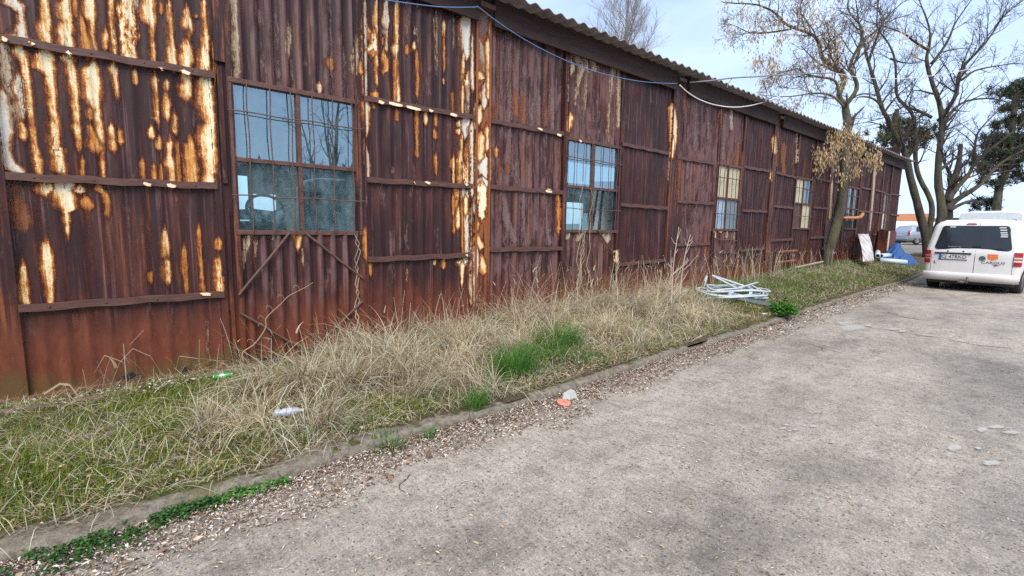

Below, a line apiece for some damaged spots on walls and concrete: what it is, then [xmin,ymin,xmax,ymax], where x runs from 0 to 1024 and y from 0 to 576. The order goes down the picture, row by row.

corrosion [43,136,70,185]
corrosion [77,176,112,219]
peeling [0,0,220,241]
corrosion [138,155,164,180]
peeling [313,0,526,308]
peeling [529,54,599,142]
corrosion [667,101,678,160]
corrosion [768,132,799,183]
peeling [17,233,57,304]
peeling [158,223,173,288]
corrosion [179,222,206,294]
peeling [200,235,225,296]